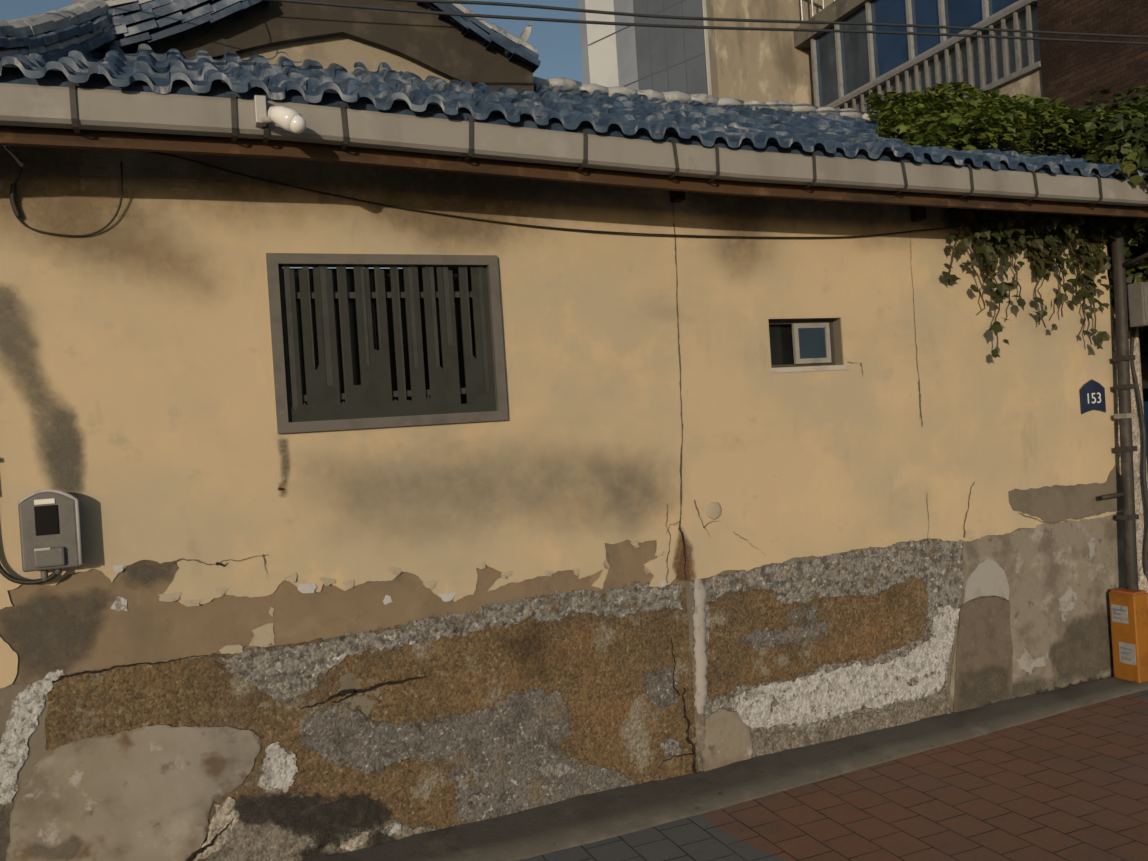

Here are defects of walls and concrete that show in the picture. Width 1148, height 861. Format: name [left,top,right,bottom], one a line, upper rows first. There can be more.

water stain [0,289,79,491]
crack [171,554,269,578]
water stain [280,440,289,494]
crack [666,202,687,583]
corrosion [674,533,694,581]
spalling [0,511,1126,861]